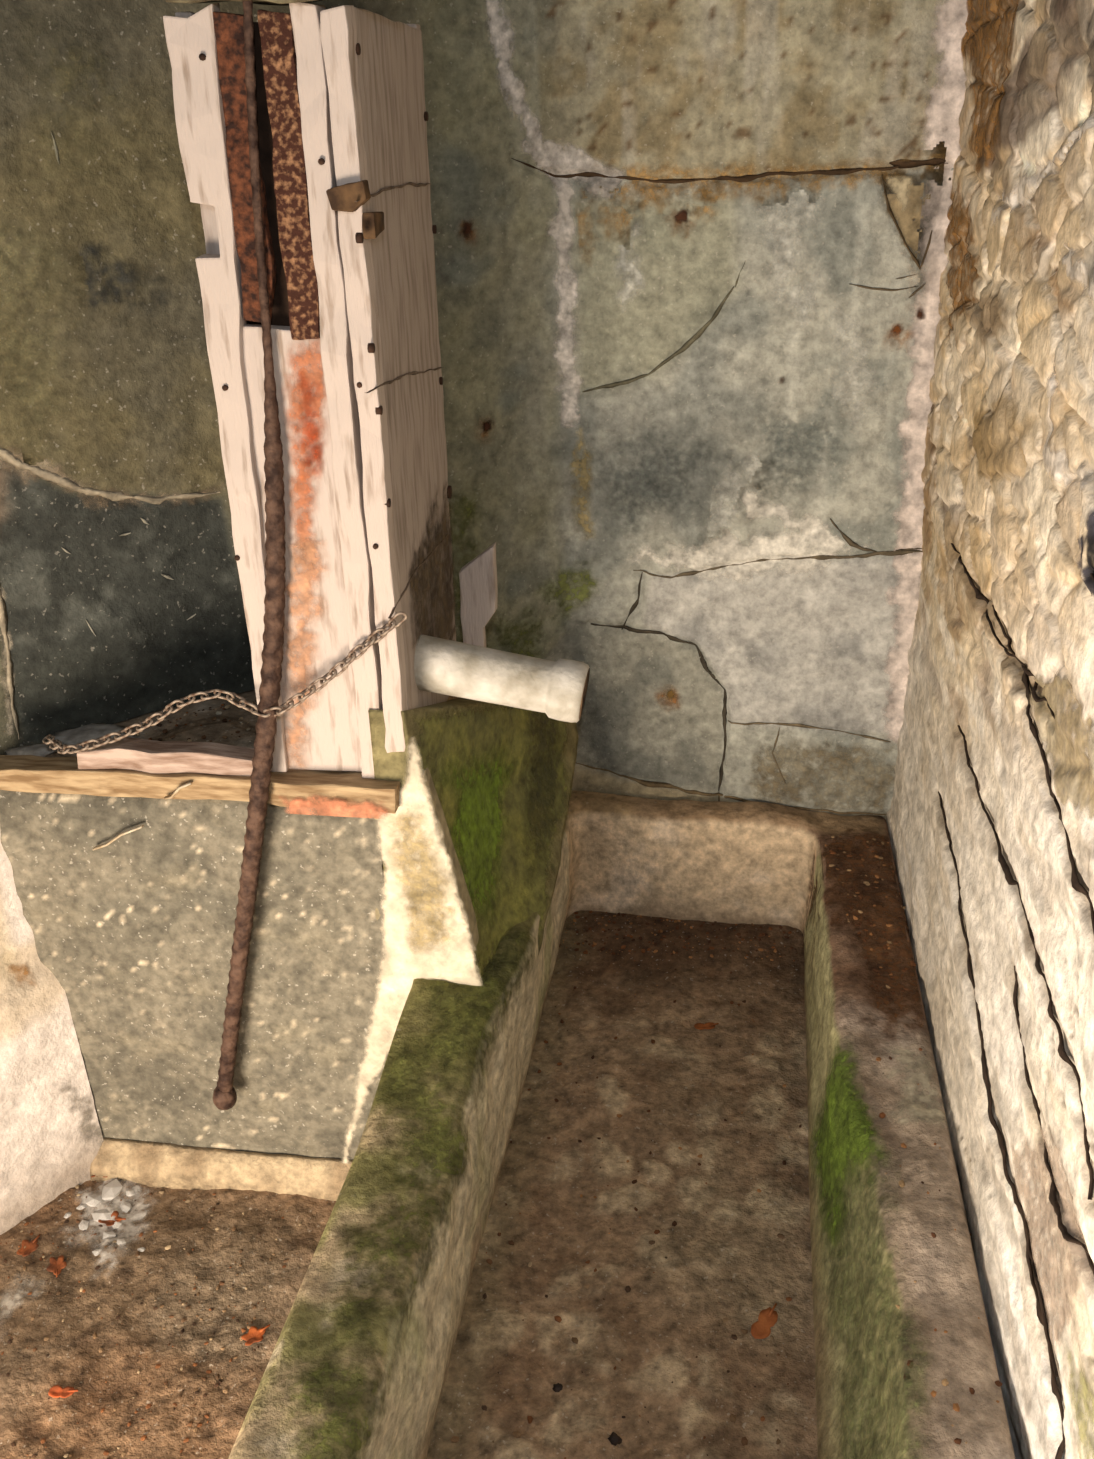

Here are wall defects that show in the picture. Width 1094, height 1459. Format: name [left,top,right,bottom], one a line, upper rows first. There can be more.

crack [582,260,746,392]
crack [511,158,948,184]
rust [286,342,325,765]
crack [576,518,1094,934]
damp [1078,511,1094,595]
crack [938,725,1094,1459]